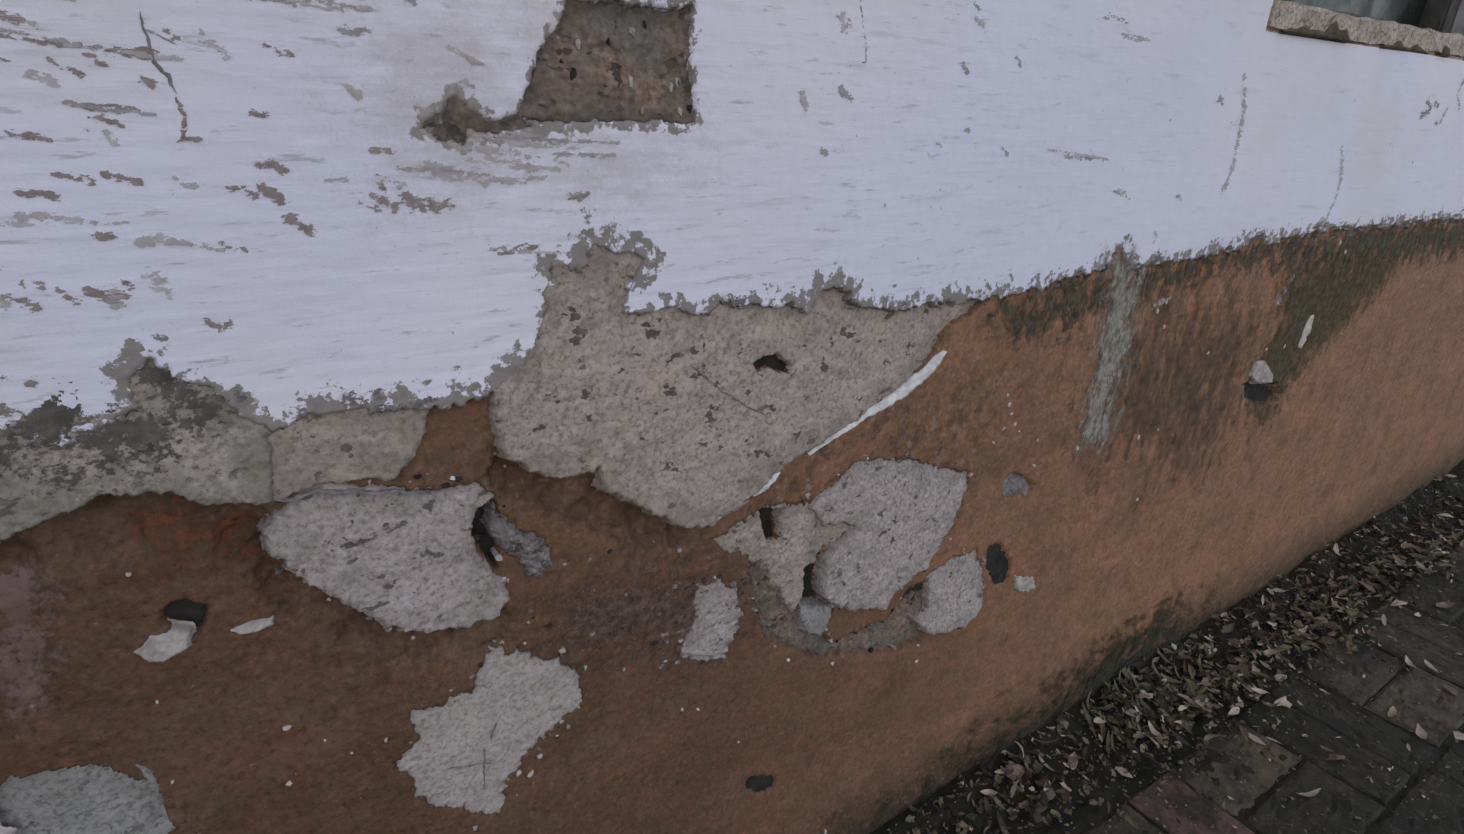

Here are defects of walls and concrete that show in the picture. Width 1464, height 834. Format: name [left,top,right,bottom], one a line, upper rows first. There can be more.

crack [140,13,187,143]
flaking render [419,0,697,147]
peeling [0,357,432,544]
peeling [479,244,991,669]
hole [134,598,207,663]
flaking render [0,764,175,834]
peeling [392,639,582,831]